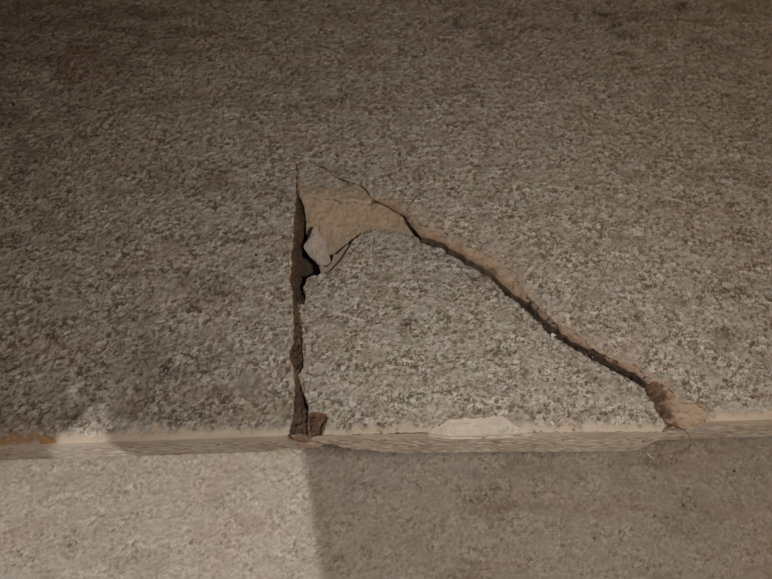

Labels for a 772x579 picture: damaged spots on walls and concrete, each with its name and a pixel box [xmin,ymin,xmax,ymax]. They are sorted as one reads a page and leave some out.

crack [280,156,371,443]
spalling [296,161,707,454]
crack [412,225,656,396]